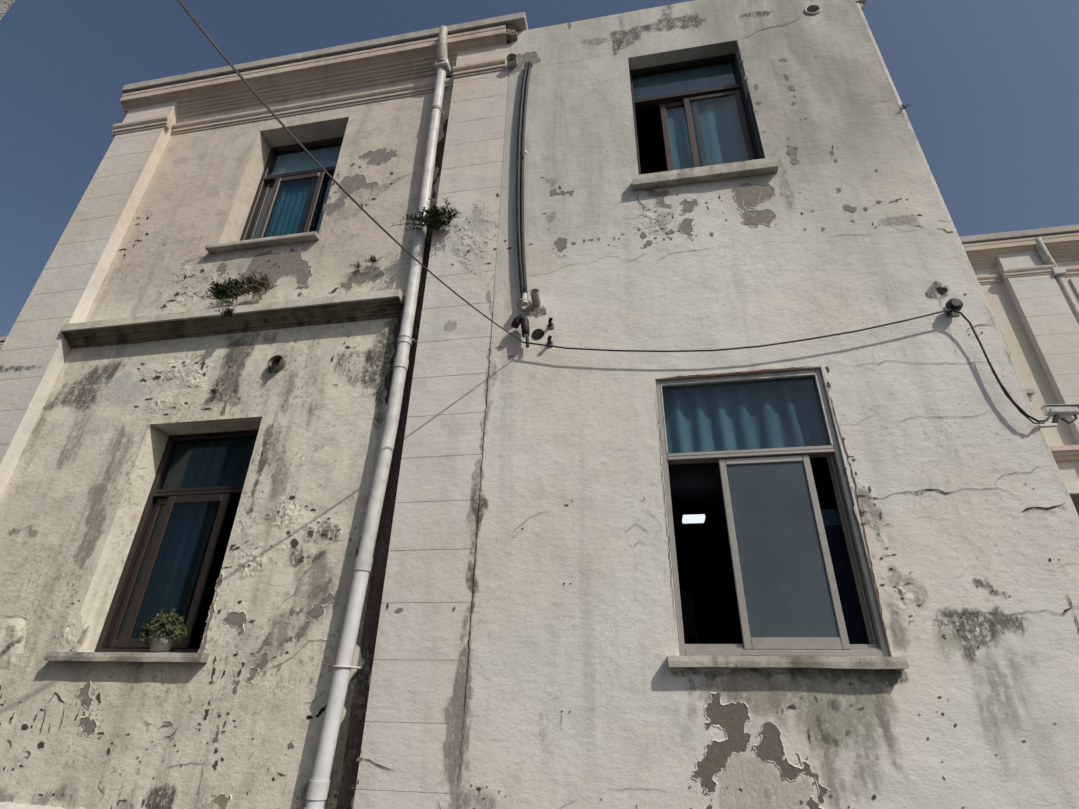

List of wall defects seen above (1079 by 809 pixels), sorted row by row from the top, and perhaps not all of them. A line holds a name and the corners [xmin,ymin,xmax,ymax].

peeling [323,148,404,220]
peeling [541,177,578,196]
peeling [543,181,782,257]
peeling [241,248,313,298]
water stain [34,362,121,433]
water stain [76,427,130,568]
crack [862,465,1066,512]
water stain [290,547,332,625]
water stain [935,578,1024,661]
peeling [0,680,113,770]
peeling [689,691,833,809]